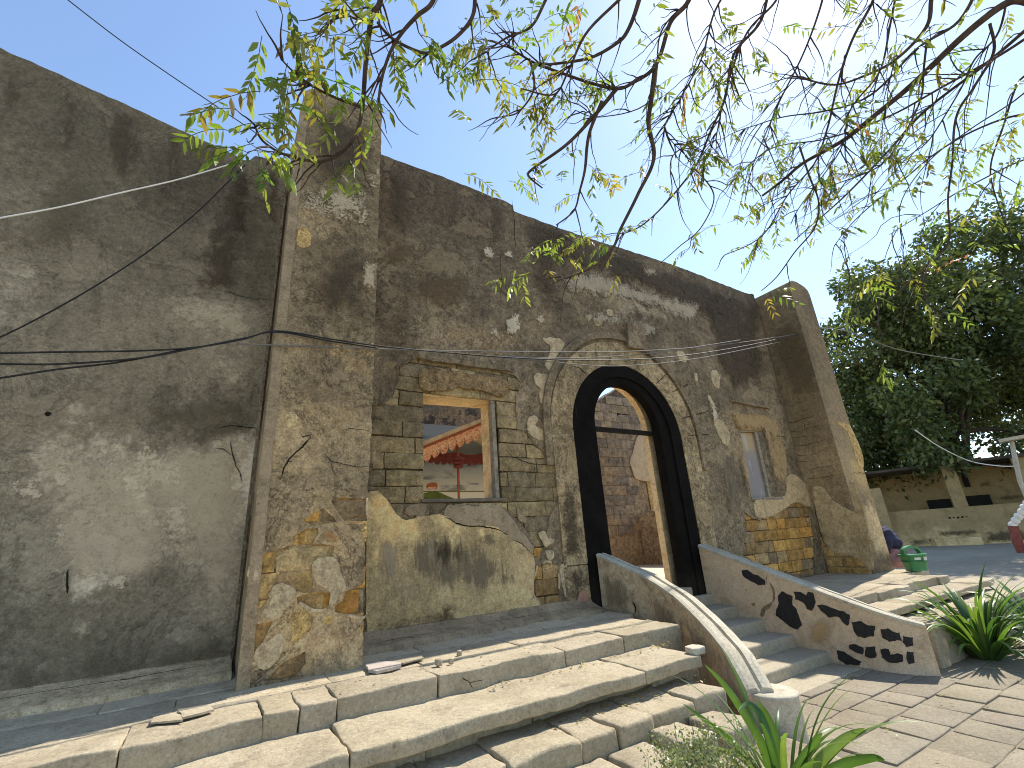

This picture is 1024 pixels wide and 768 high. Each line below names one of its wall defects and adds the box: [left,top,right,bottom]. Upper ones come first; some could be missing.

water stain [197,168,252,288]
peeling [491,314,520,338]
peeling [534,337,564,403]
peeling [708,370,730,446]
crack [216,425,256,482]
crack [280,433,368,480]
peeling [12,480,44,501]
flaking render [40,357,588,680]
flaking render [743,474,874,576]
water stain [379,535,513,589]